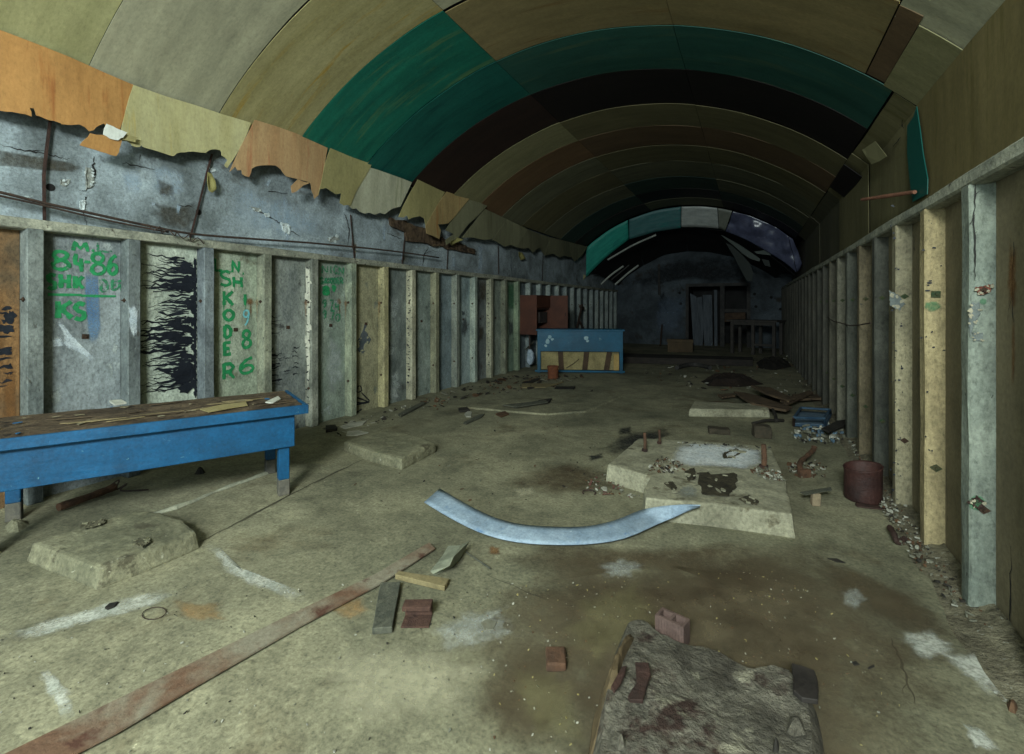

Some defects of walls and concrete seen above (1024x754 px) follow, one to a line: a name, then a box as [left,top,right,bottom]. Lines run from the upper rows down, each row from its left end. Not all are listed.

corrosion [42,120,52,220]
spalling [79,166,95,210]
corrosion [189,154,213,238]
crack [970,184,978,281]
peeling [967,284,994,342]